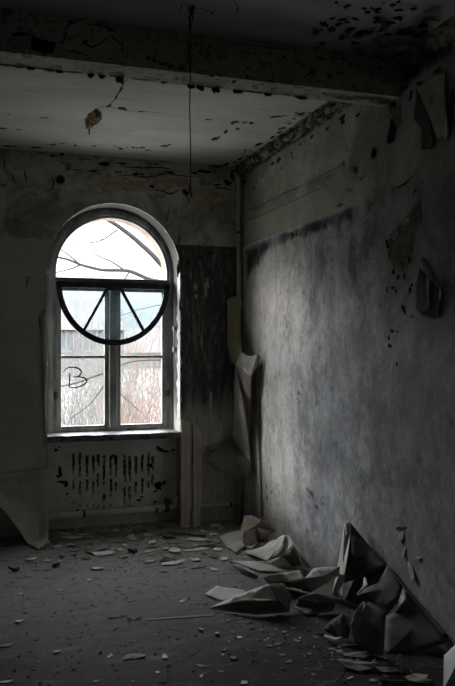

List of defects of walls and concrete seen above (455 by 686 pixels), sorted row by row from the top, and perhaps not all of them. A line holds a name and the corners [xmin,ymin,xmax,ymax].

peeling [311,0,445,61]
spalling [0,64,149,135]
peeling [187,85,220,94]
flaking render [29,102,348,206]
flaking render [386,200,422,295]
peeling [206,295,261,478]
peeling [0,465,69,550]